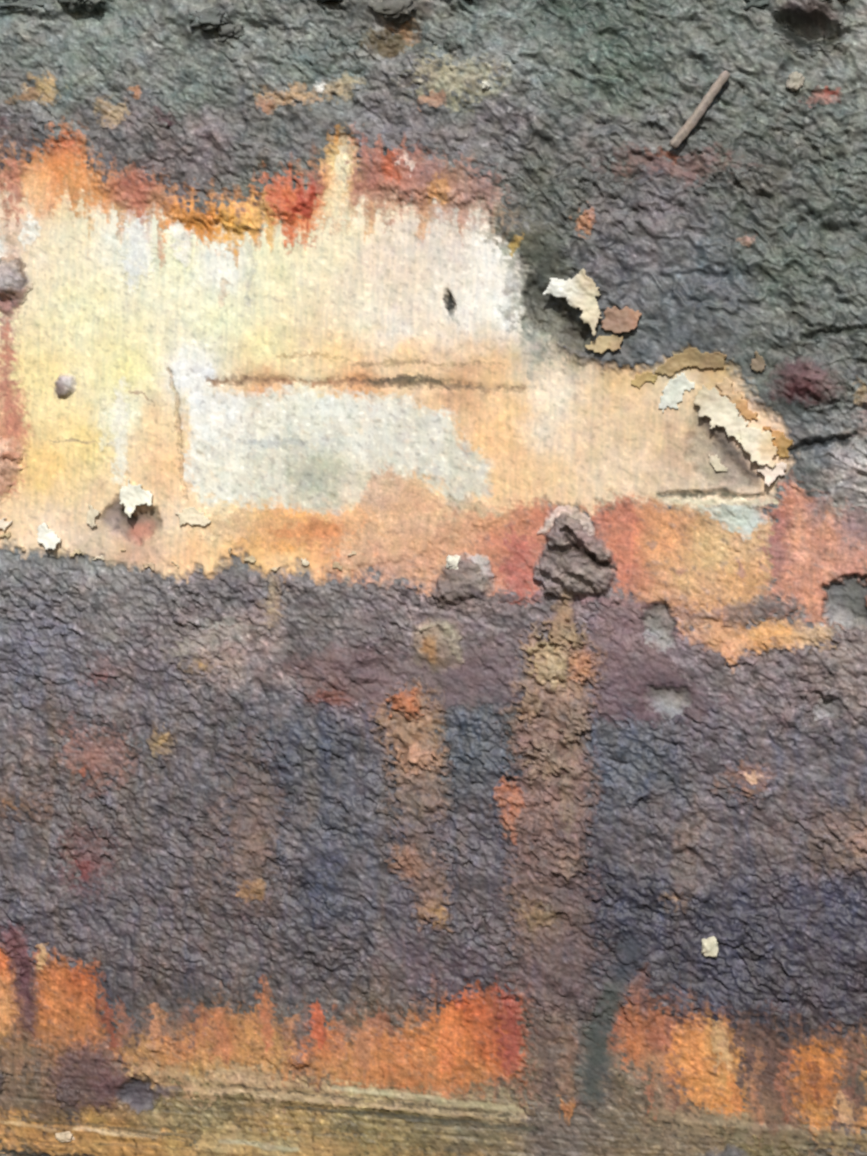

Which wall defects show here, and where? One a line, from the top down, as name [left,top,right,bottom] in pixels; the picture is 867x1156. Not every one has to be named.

corrosion [0,68,527,504]
peeling [0,189,802,588]
corrosion [0,461,867,1126]
spalling [821,573,867,632]
corrosion [612,960,867,1156]